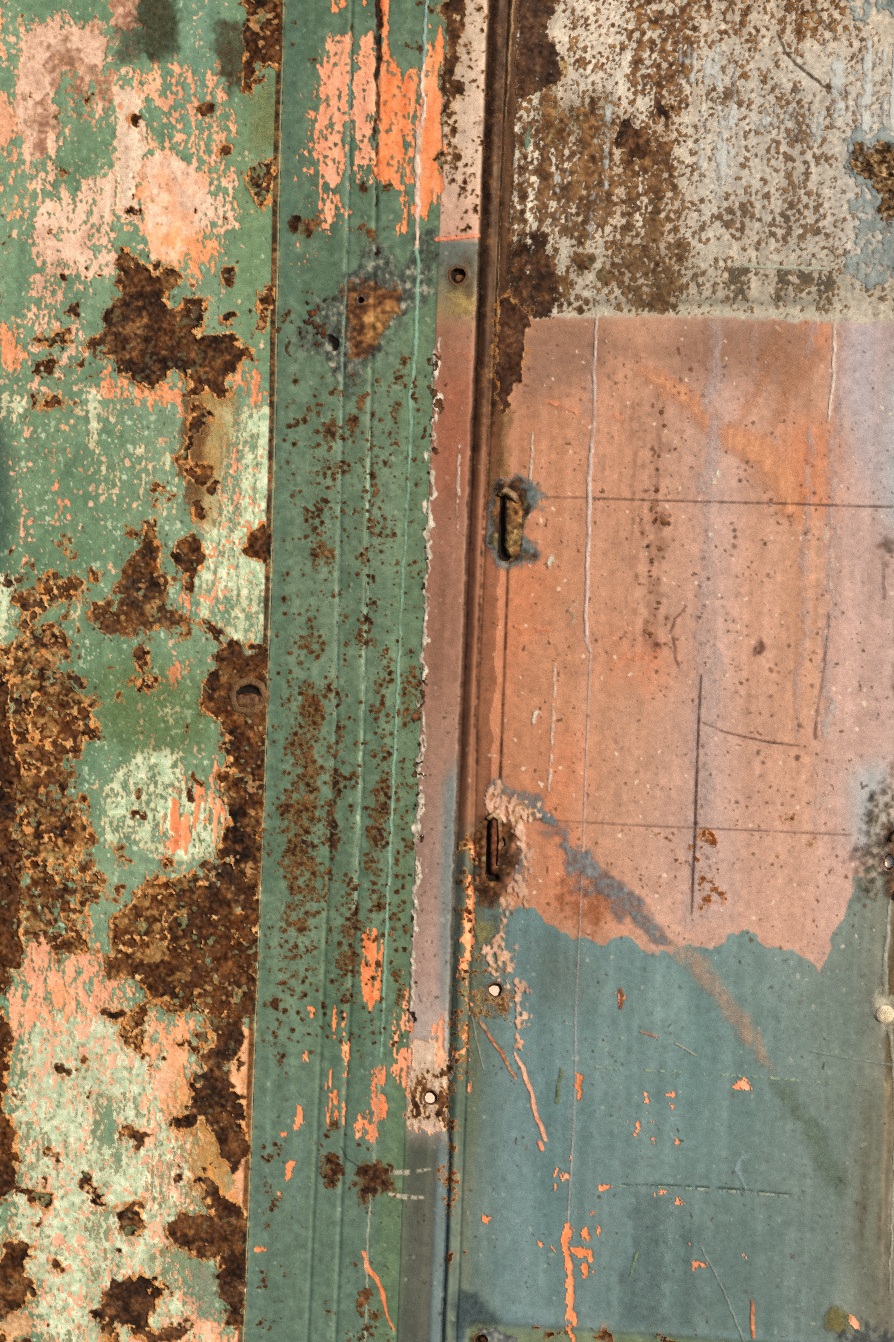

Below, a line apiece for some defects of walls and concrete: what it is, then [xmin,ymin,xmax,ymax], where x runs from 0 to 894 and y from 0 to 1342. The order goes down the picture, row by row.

peeling [294,0,480,386]
peeling [0,0,240,645]
peeling [171,365,273,645]
rust [488,454,537,564]
rust [641,487,671,525]
rust [656,828,727,910]
peeling [0,911,239,1342]
peeling [229,1025,253,1128]
rust [403,814,519,1216]
rust [882,953,894,1058]
peeling [538,1212,601,1342]
rust [594,1328,614,1342]